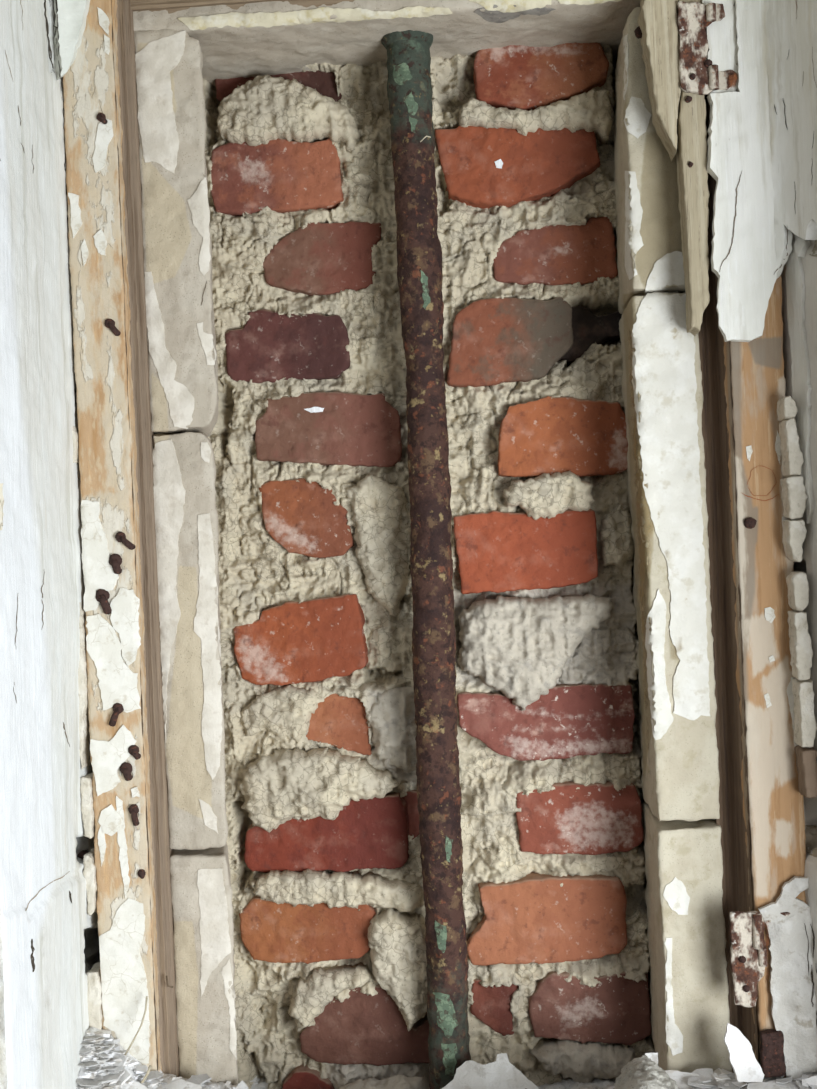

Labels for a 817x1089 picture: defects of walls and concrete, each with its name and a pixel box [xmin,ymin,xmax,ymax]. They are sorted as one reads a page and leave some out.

peeling [187,173,211,275]
peeling [135,6,453,173]
crack [720,172,742,269]
flaking render [707,0,817,524]
crack [774,47,817,274]
peeling [144,272,194,742]
peeling [625,171,710,740]
peeling [194,513,223,780]
peeling [81,500,150,1064]
peeling [197,868,237,1058]
peeling [664,938,683,1056]
peeling [724,876,817,1089]